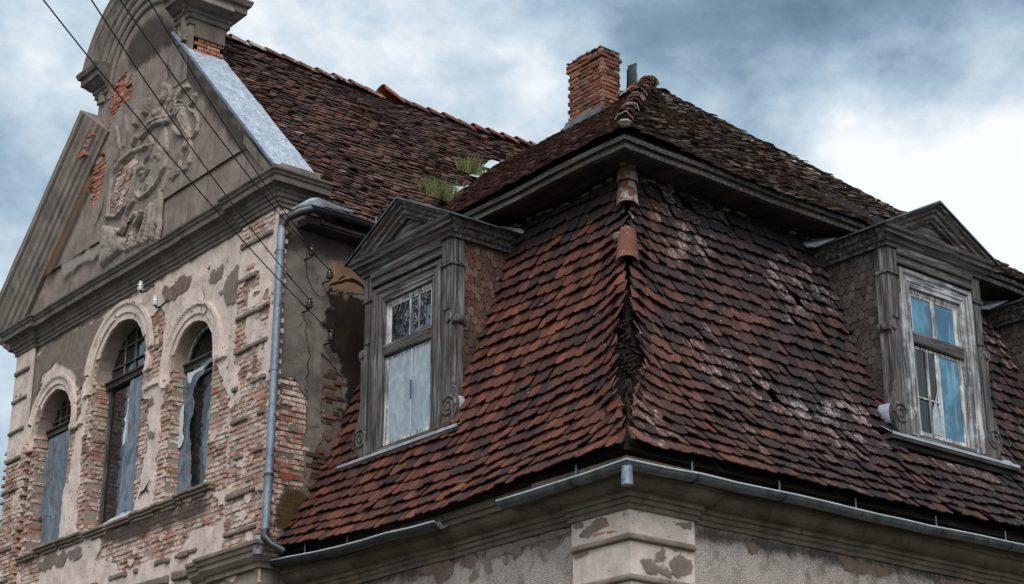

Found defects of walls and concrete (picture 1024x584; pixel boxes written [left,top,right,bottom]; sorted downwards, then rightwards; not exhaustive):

spalling [79,69,138,210]
peeling [29,318,103,530]
spalling [98,209,348,572]
crack [298,309,320,446]
water stain [322,290,365,423]
spalling [0,441,82,584]
peeling [640,547,693,578]